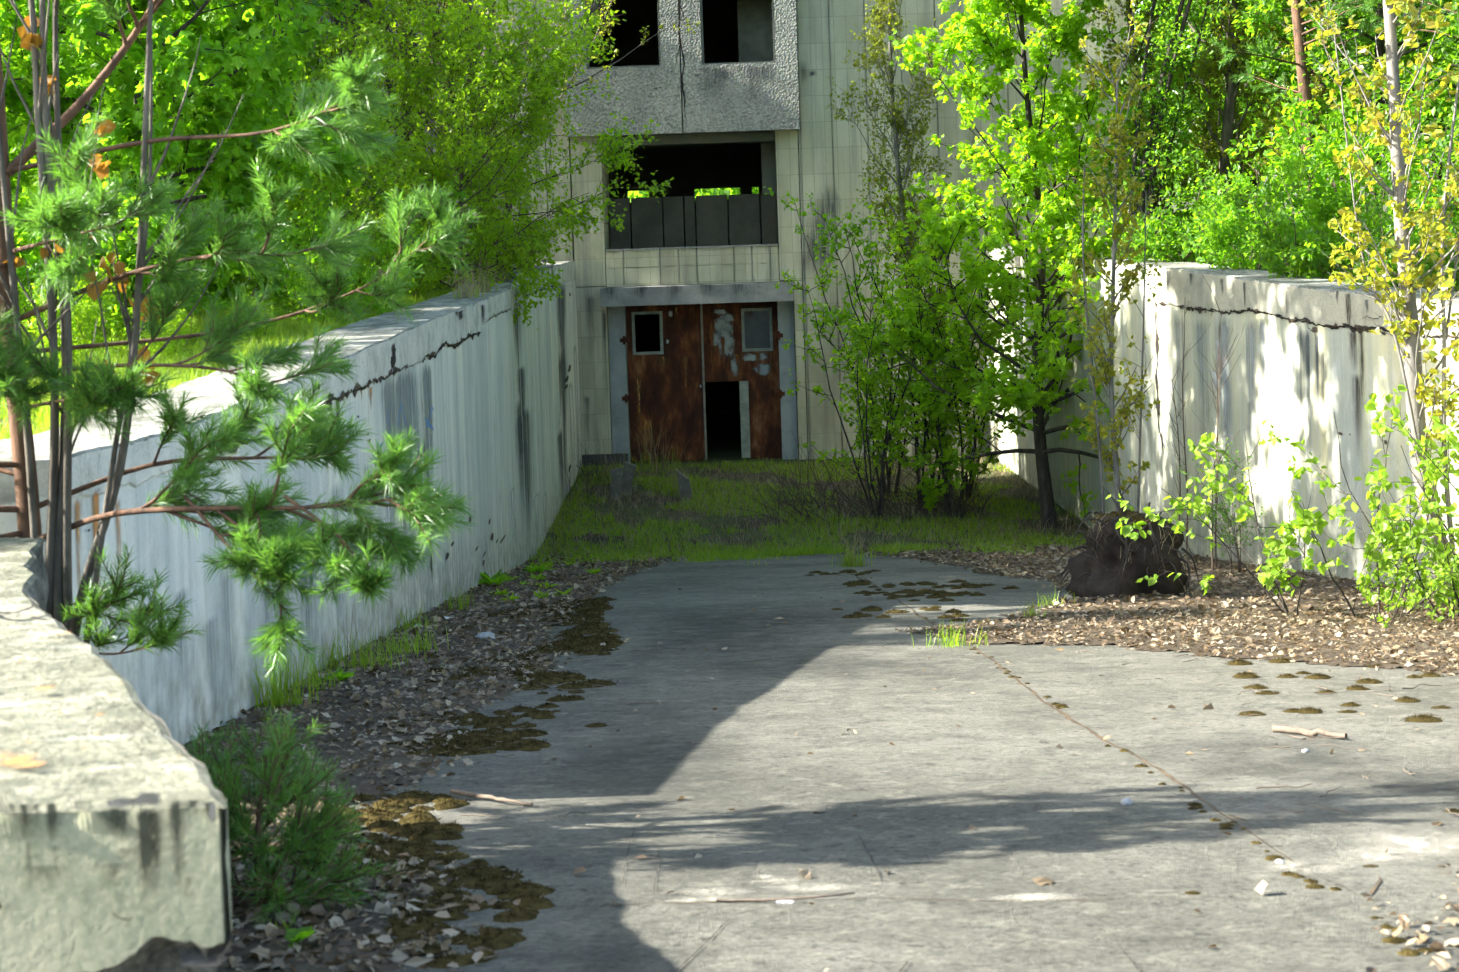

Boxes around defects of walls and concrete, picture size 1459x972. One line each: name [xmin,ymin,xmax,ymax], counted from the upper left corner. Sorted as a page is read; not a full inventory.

crack [177,286,564,486]
water stain [512,264,588,527]
peeling [713,309,769,375]
crack [1154,281,1459,450]
water stain [1299,330,1324,414]
spalling [27,542,68,632]
spalling [140,702,209,774]
crack [860,575,1381,897]
water stain [9,803,57,852]
water stain [103,800,213,881]
spalling [97,799,236,972]
crack [551,828,729,972]